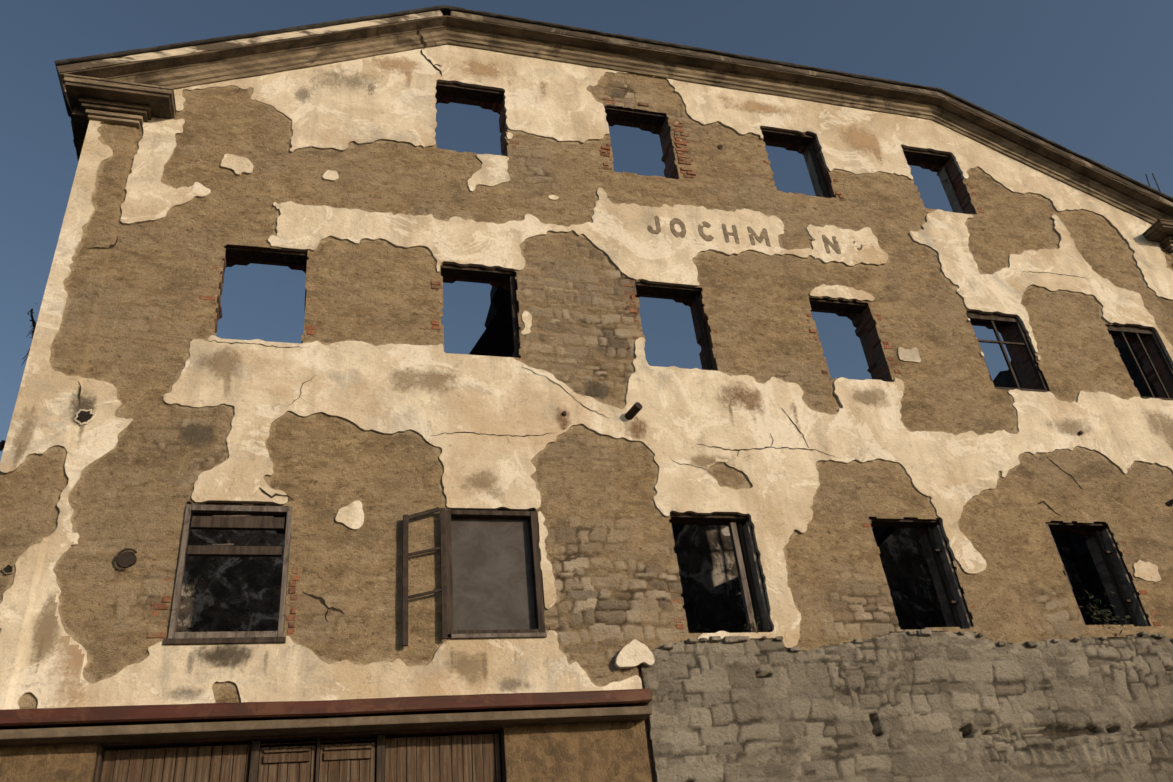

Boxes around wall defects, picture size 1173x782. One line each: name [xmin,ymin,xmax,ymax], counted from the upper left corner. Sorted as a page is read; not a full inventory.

spalling [0,73,1018,687]
crack [430,432,557,441]
crack [670,410,835,476]
spalling [783,446,1173,650]
crack [303,592,345,622]
spalling [18,693,38,709]
spalling [212,682,241,703]